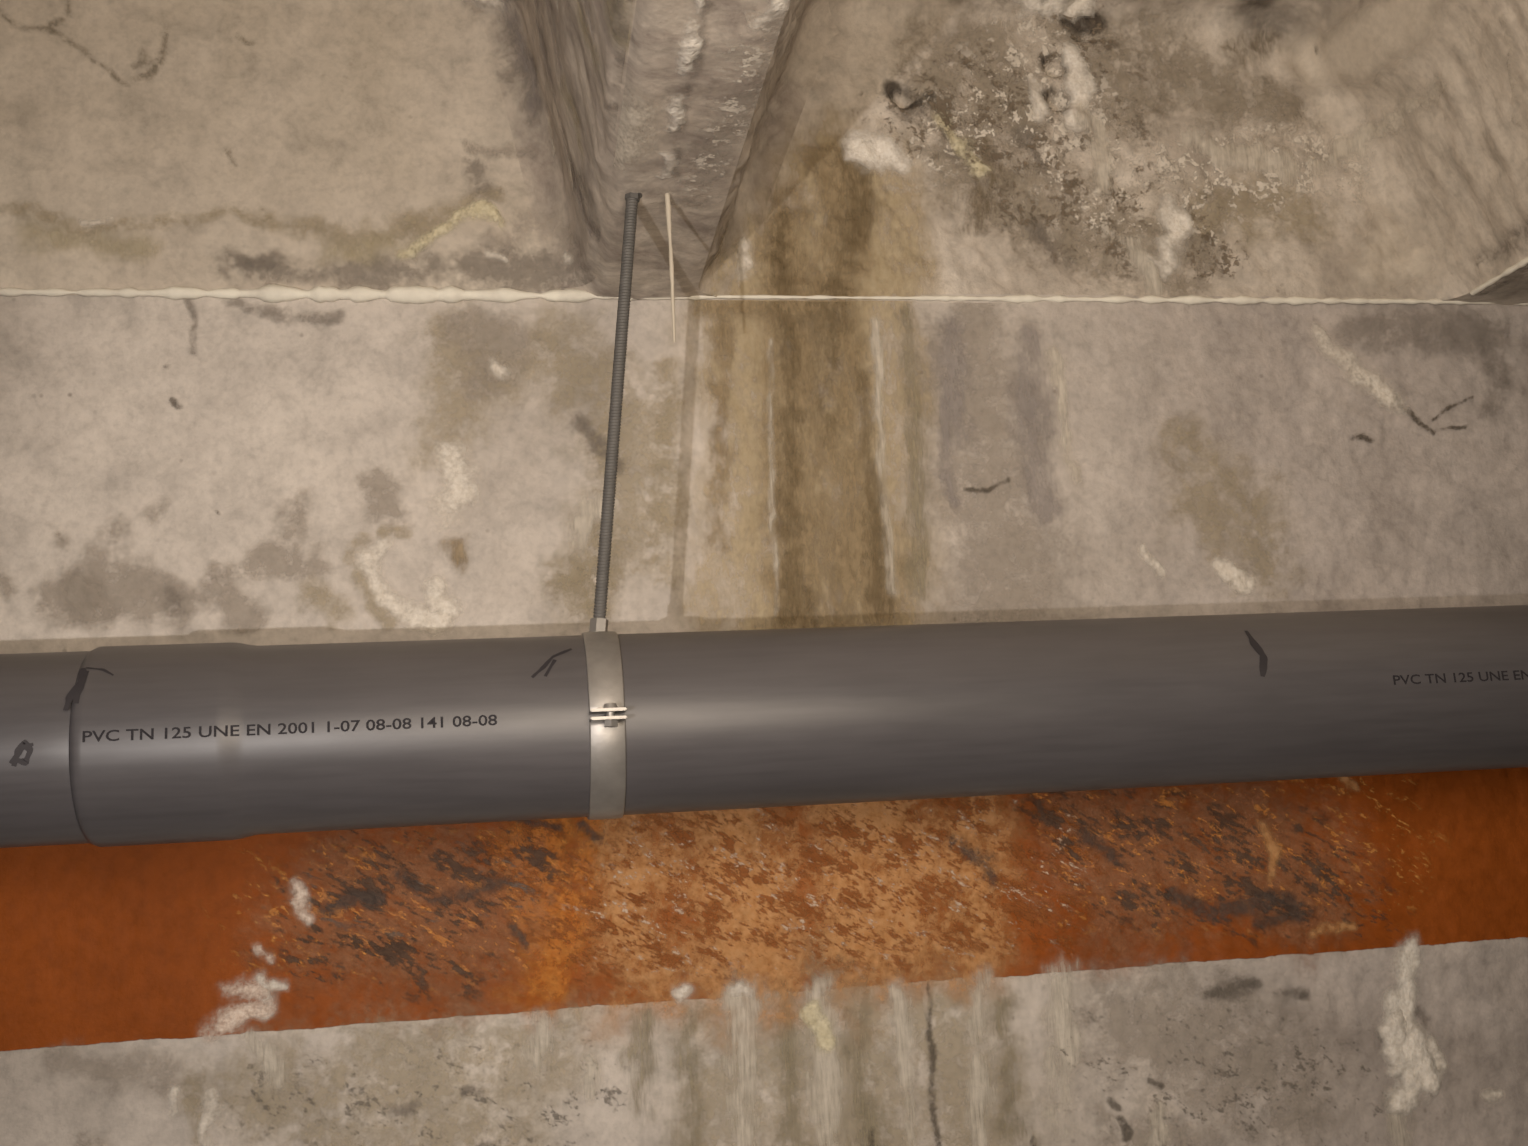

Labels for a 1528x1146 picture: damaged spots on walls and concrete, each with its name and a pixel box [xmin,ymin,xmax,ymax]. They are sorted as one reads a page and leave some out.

water stain [685,15,784,207]
water stain [845,0,1444,296]
water stain [234,827,594,1007]
water stain [725,983,759,1146]
water stain [780,980,878,1146]
water stain [890,985,941,1146]
water stain [969,973,1014,1146]
efflorescence [1379,938,1447,1146]